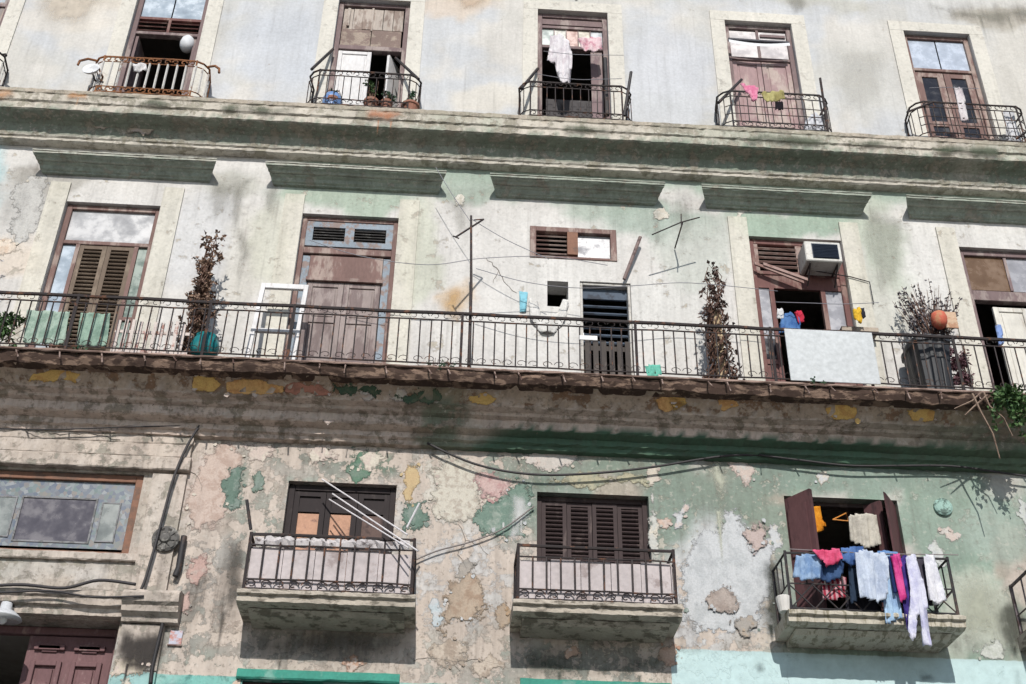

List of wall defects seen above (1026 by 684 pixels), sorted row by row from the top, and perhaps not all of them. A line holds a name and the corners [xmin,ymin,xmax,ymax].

peeling [0,174,51,256]
spalling [192,375,442,405]
spalling [654,397,687,412]
peeling [184,441,274,532]
peeling [400,456,534,542]
peeling [520,453,690,560]
peeling [727,462,755,488]
peeling [182,552,213,615]
peeling [426,558,511,682]
peeling [657,642,681,669]
peeling [677,508,783,638]